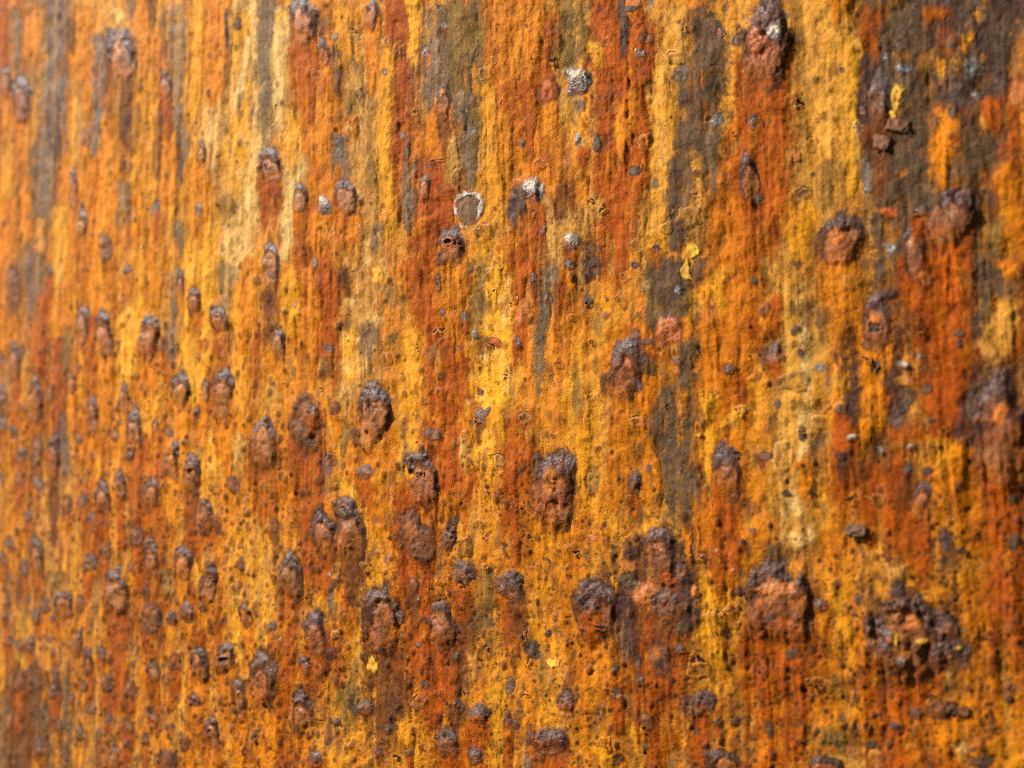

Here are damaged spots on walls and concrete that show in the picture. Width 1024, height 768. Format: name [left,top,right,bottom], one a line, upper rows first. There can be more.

rust [0,0,492,768]
rust [472,0,1024,768]